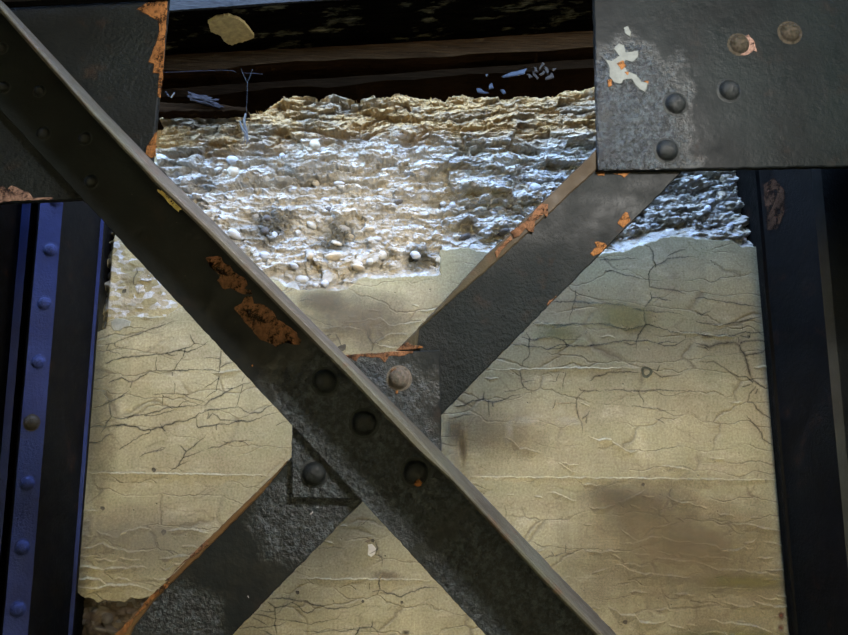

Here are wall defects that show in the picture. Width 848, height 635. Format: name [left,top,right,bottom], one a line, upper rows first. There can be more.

corrosion [137,0,168,98]
peeling [605,43,648,92]
corrosion [0,186,53,203]
spalling [156,87,596,291]
spalling [601,171,753,254]
corrosion [206,256,302,346]
crack [449,245,771,444]
crack [89,321,282,471]
crack [240,542,437,635]